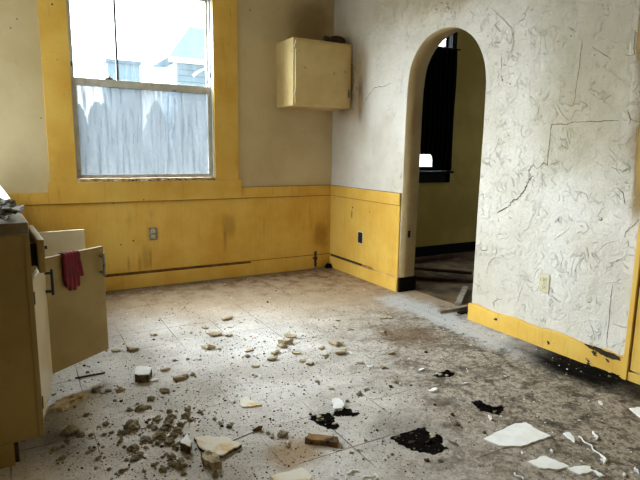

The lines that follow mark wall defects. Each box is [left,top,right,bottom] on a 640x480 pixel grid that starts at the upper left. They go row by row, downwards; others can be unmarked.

crack [497,110,638,213]
peeling [581,342,621,377]